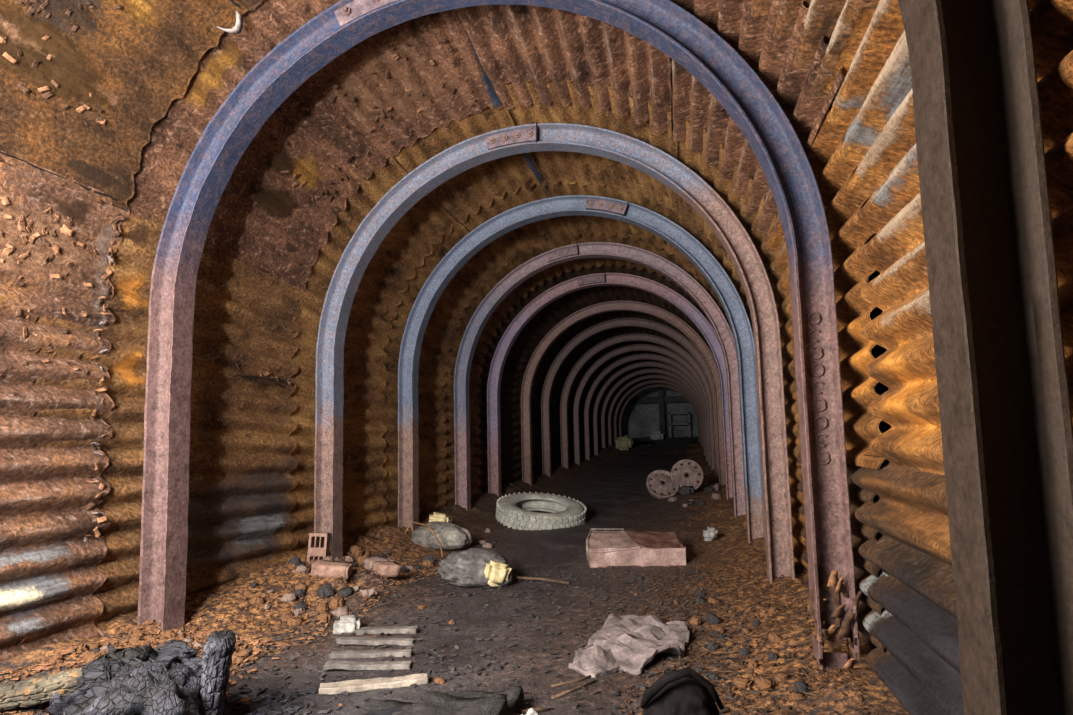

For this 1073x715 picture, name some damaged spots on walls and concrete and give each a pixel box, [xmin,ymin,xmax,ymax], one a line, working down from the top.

efflorescence [0,546,68,566]
efflorescence [0,575,69,634]
corrosion [808,566,862,669]